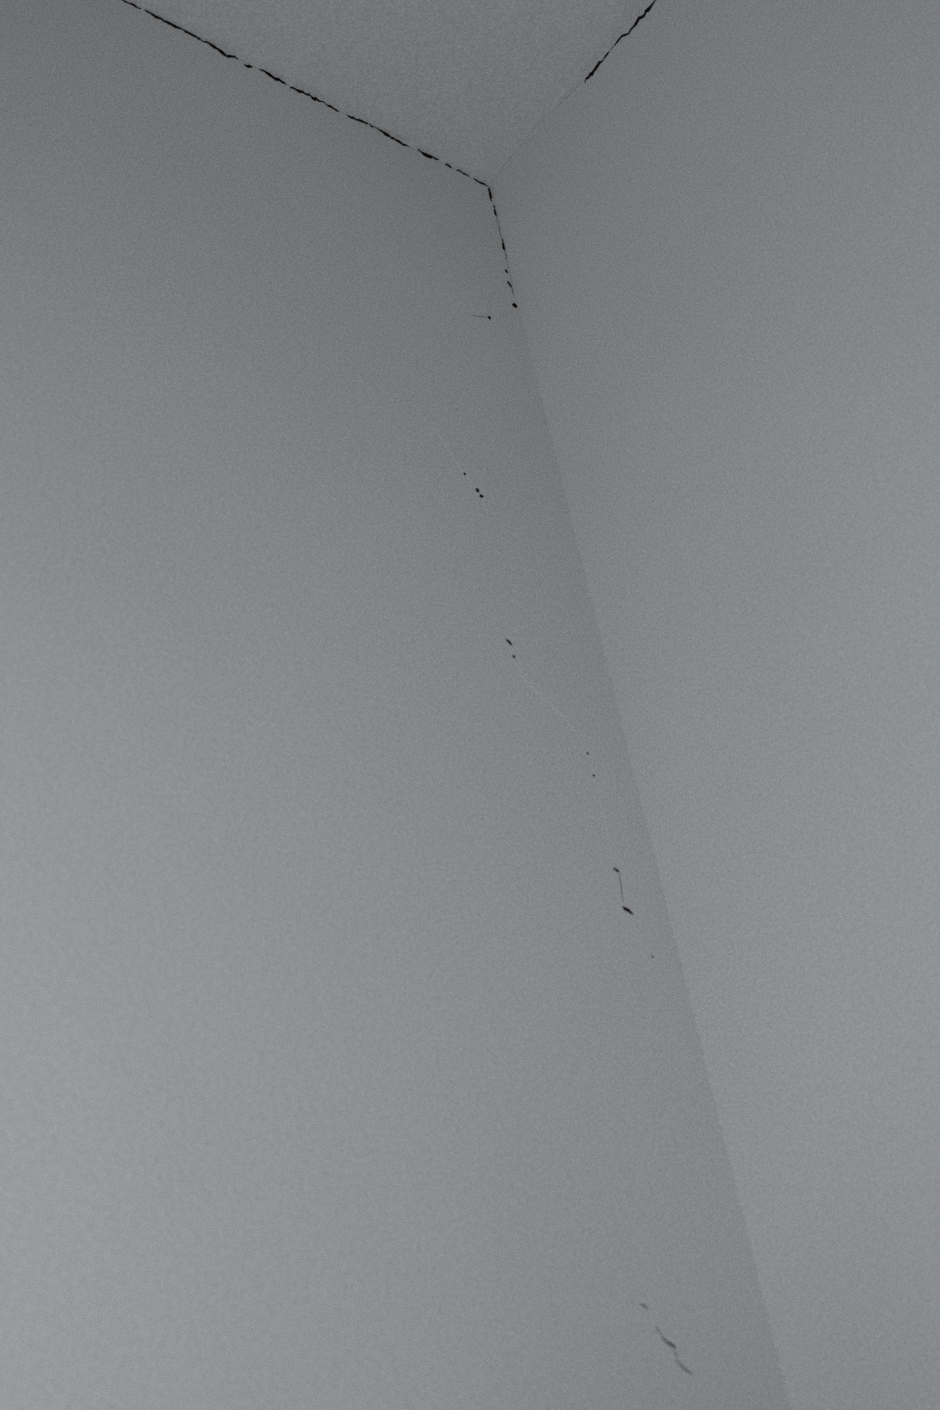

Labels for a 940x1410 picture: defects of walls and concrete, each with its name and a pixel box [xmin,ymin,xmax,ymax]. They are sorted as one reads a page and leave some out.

crack [122,0,657,319]
crack [640,1303,693,1375]